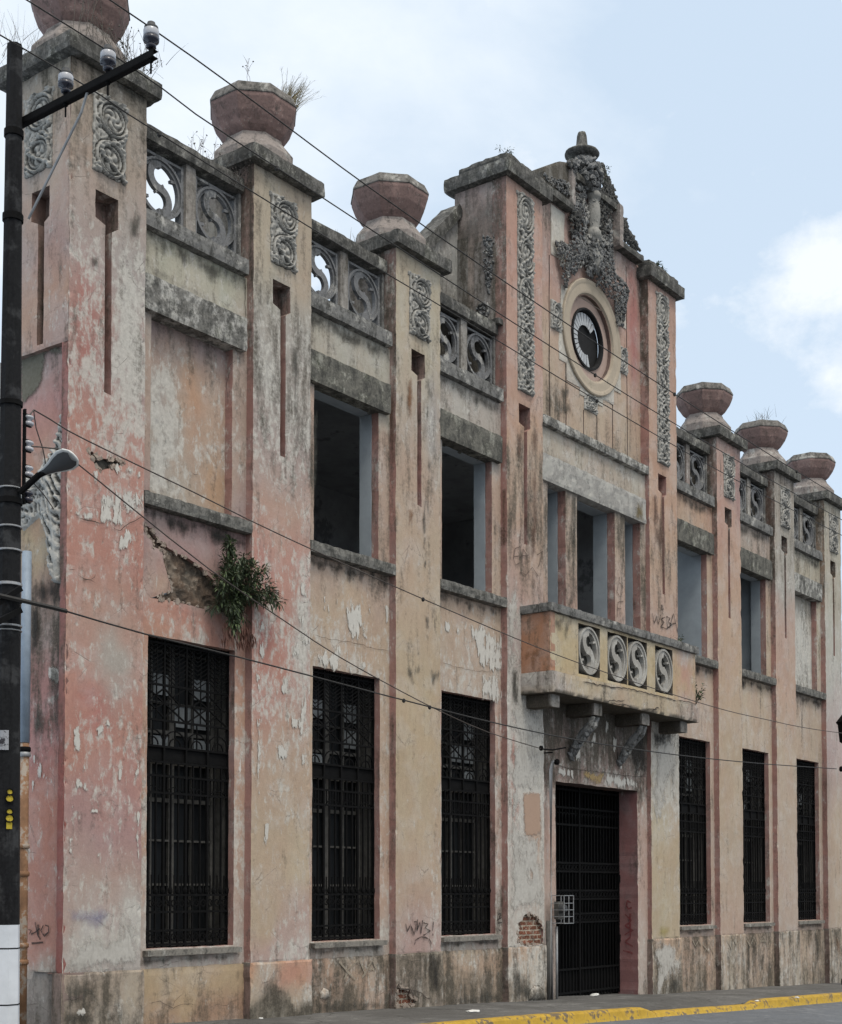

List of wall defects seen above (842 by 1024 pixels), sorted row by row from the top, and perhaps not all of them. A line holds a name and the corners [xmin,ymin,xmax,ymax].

spalling [86,447,140,483]
peeling [70,487,143,551]
spalling [144,523,237,624]
peeling [318,604,371,673]
peeling [445,592,517,703]
peeling [291,683,308,735]
peeling [509,706,544,947]
spalling [394,983,418,1009]